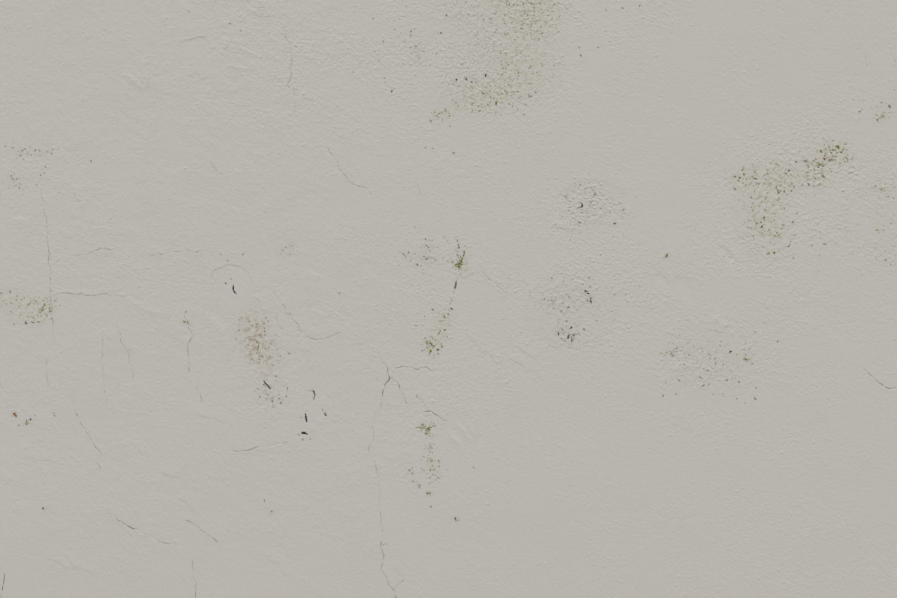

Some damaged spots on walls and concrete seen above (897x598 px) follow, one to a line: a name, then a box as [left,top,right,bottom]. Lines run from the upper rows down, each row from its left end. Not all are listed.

damp [394,0,571,127]
damp [725,134,897,268]
damp [0,283,61,328]
damp [420,299,458,358]
crack [381,363,447,422]
damp [405,422,448,507]